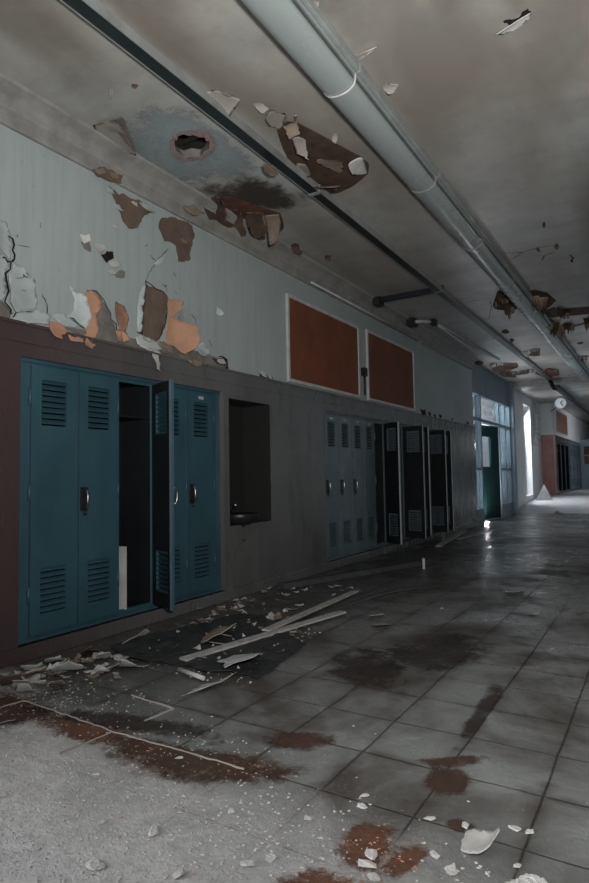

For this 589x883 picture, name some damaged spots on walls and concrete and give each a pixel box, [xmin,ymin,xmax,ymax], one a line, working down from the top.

damp [131,108,294,209]
peeling [253,102,369,194]
peeling [93,167,284,262]
peeling [0,220,228,372]
peeling [530,290,589,344]
rust [0,692,299,785]
rust [265,732,333,750]
rust [421,755,481,795]
rust [278,867,351,883]
rust [335,822,427,877]